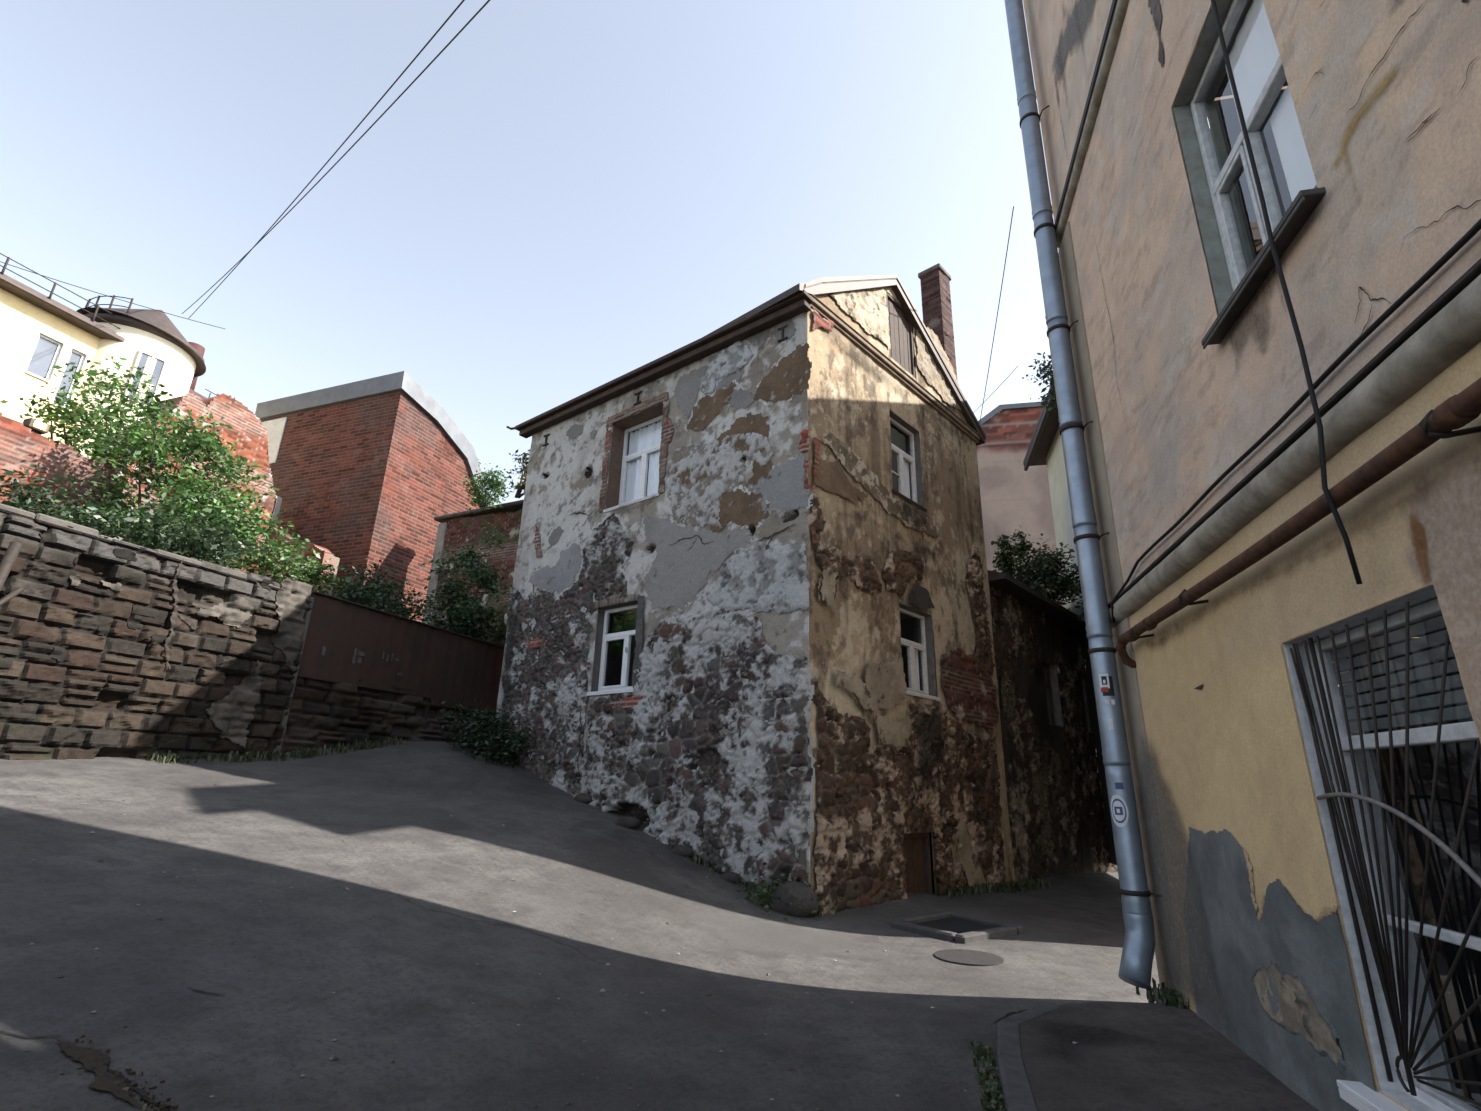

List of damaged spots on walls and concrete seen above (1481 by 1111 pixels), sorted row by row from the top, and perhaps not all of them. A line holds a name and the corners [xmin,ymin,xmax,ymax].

crack [1305,0,1427,126]
crack [1404,56,1478,144]
crack [1400,200,1481,251]
crack [1355,287,1391,335]
flaking render [499,288,1006,916]
rust [1411,516,1428,581]
peeling [1409,456,1481,743]
spalling [1251,960,1347,1078]